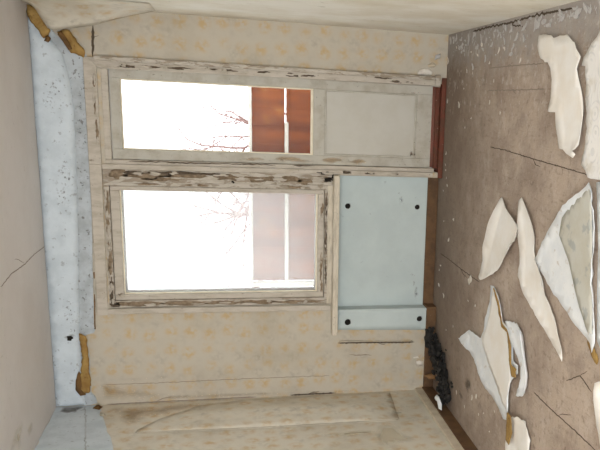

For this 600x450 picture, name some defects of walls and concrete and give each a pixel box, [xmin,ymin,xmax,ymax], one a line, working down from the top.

crack [473,8,572,32]
peeling [108,161,334,190]
crack [492,147,587,175]
peeling [21,0,155,450]
peeling [104,189,325,307]